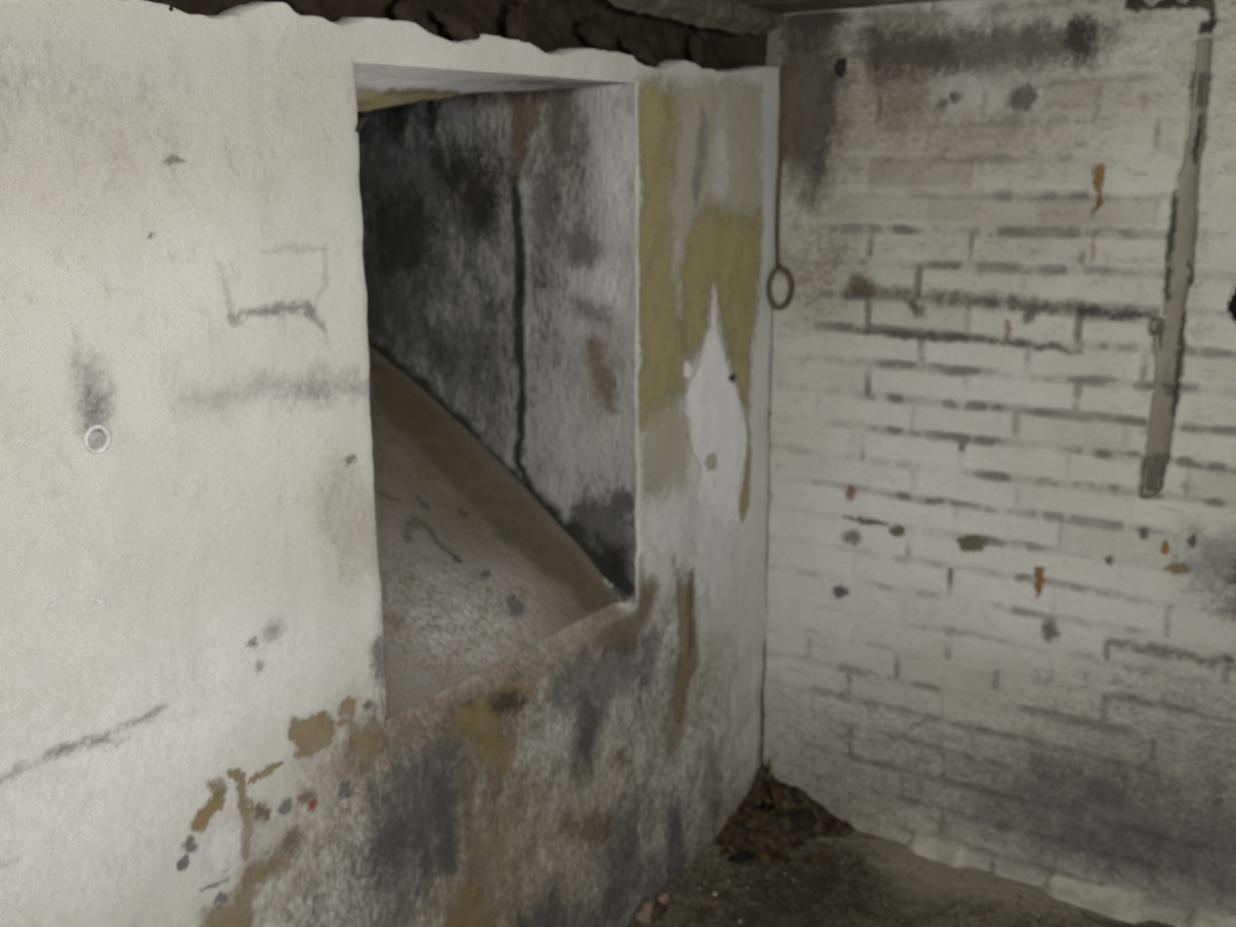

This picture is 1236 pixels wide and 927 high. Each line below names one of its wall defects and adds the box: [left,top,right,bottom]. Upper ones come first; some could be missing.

damp [357,88,504,354]
peeling [145,0,783,607]
crack [511,81,599,484]
damp [757,1,875,204]
rust [1093,164,1105,212]
spalling [1227,284,1236,323]
damp [572,488,657,653]
damp [673,537,698,723]
rust [1034,566,1045,595]
damp [203,829,301,927]
flaking render [177,696,386,908]
damp [666,802,685,887]